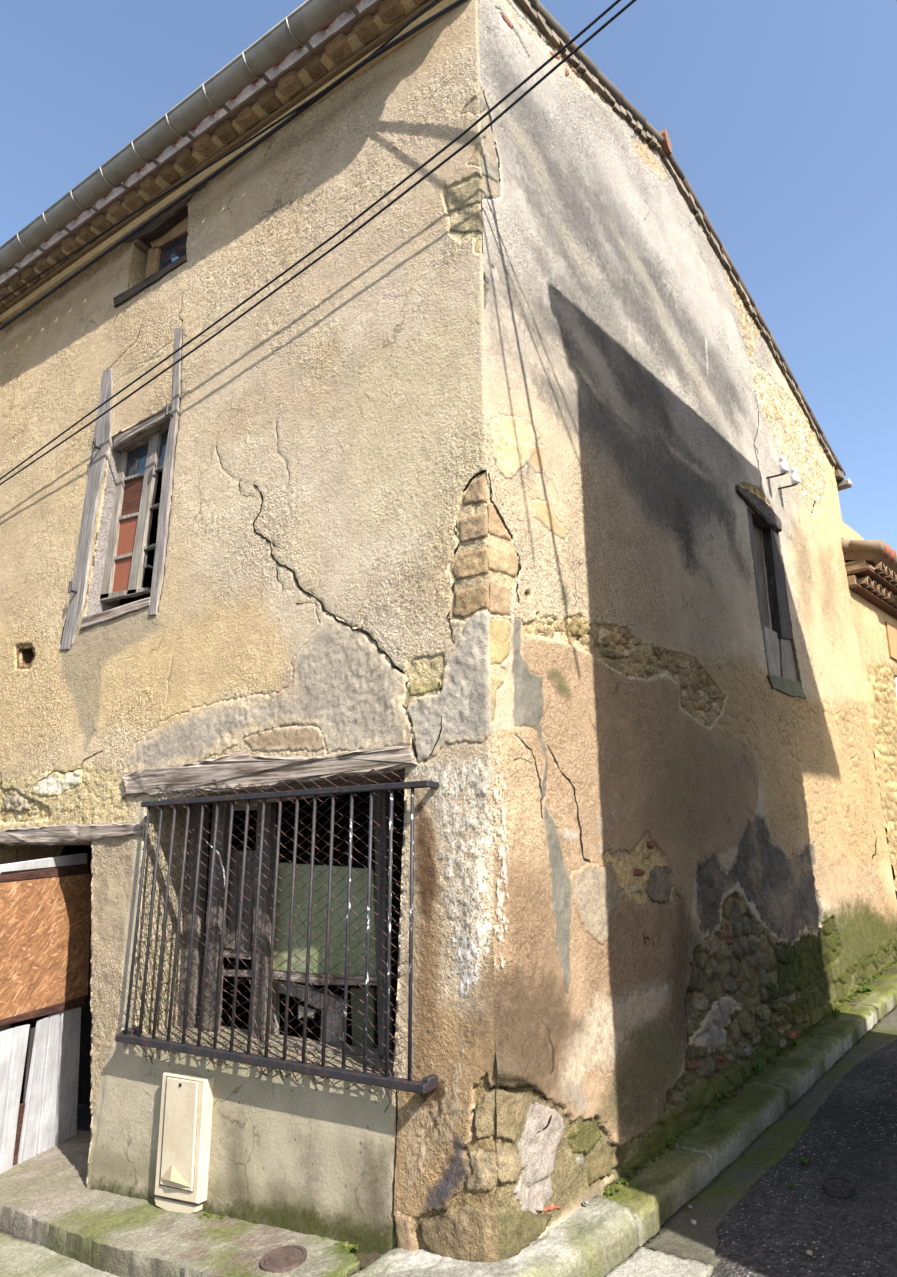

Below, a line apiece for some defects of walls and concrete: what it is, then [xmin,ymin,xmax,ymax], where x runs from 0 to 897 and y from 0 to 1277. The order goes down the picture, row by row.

crack [104,296,183,612]
leakage [546,367,735,561]
flaking render [696,220,827,513]
crack [216,422,442,762]
flaking render [449,472,725,727]
crack [514,733,591,862]
flaking render [601,833,680,908]
flaking render [664,892,841,1117]
flaking render [393,1032,645,1263]